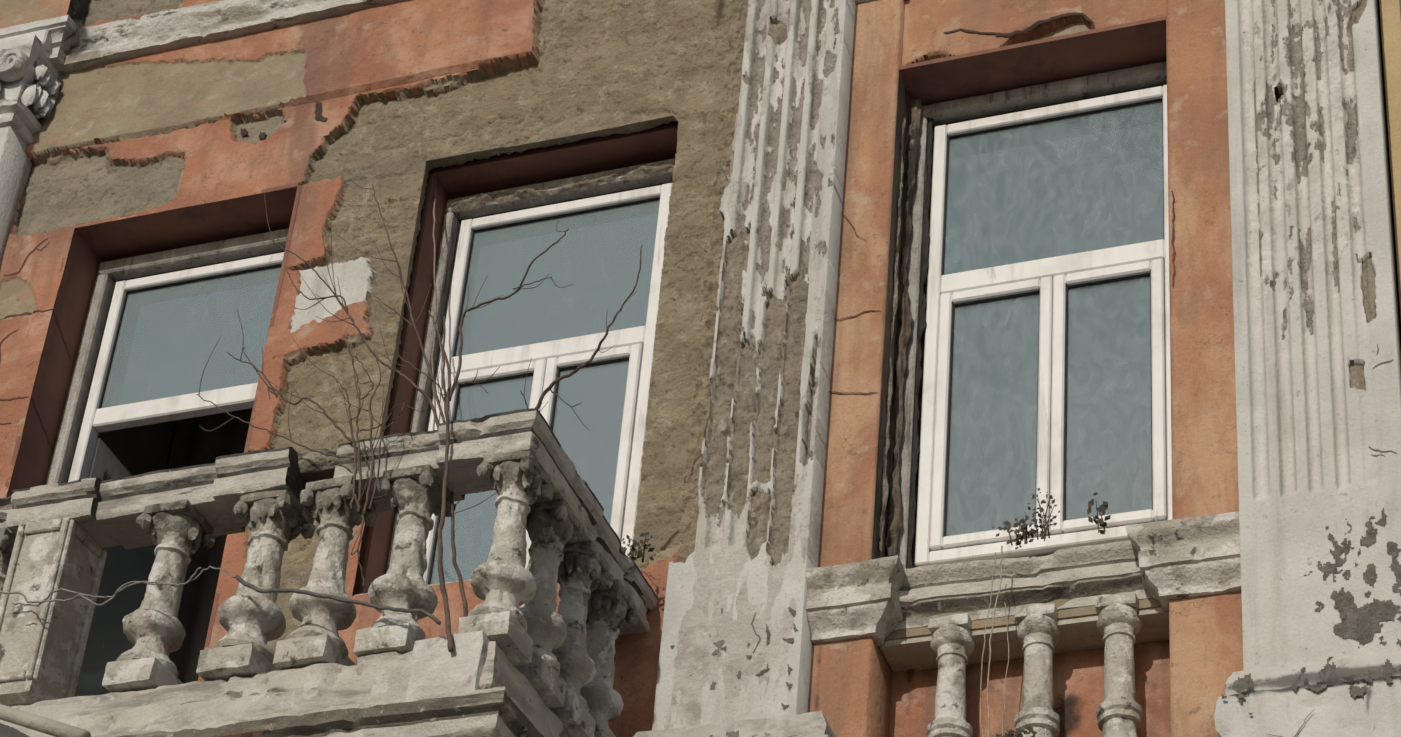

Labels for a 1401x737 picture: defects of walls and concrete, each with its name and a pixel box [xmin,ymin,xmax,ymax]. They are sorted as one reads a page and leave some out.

spalling [84,0,183,26]
peeling [11,50,309,237]
peeling [1253,0,1368,340]
crack [4,238,49,276]
spalling [254,0,840,571]
spalling [1355,252,1376,323]
crack [0,308,73,361]
spalling [1348,360,1366,391]
crack [0,396,53,450]
spalling [267,520,320,655]
peeling [1291,508,1401,697]
peeling [1222,673,1253,715]